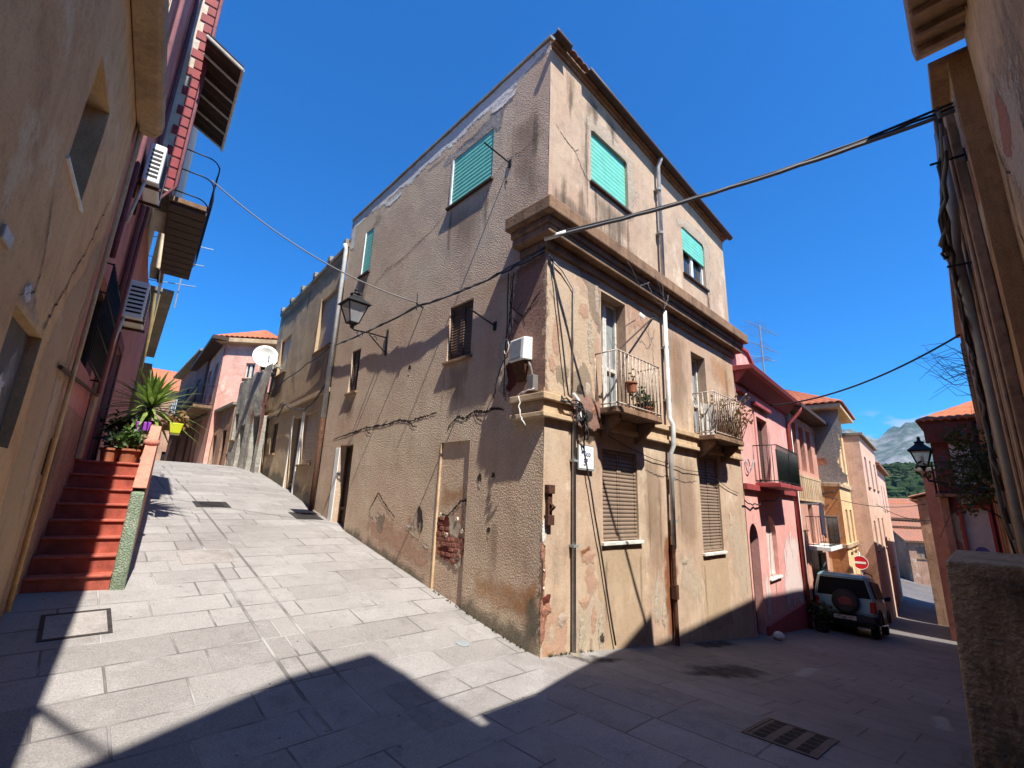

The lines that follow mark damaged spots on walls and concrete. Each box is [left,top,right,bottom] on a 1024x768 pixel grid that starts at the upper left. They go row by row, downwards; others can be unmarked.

peeling [350,43,549,249]
crack [334,284,541,440]
spalling [436,499,467,568]
water stain [481,583,538,637]
peeling [540,520,607,657]
rust [665,537,674,634]